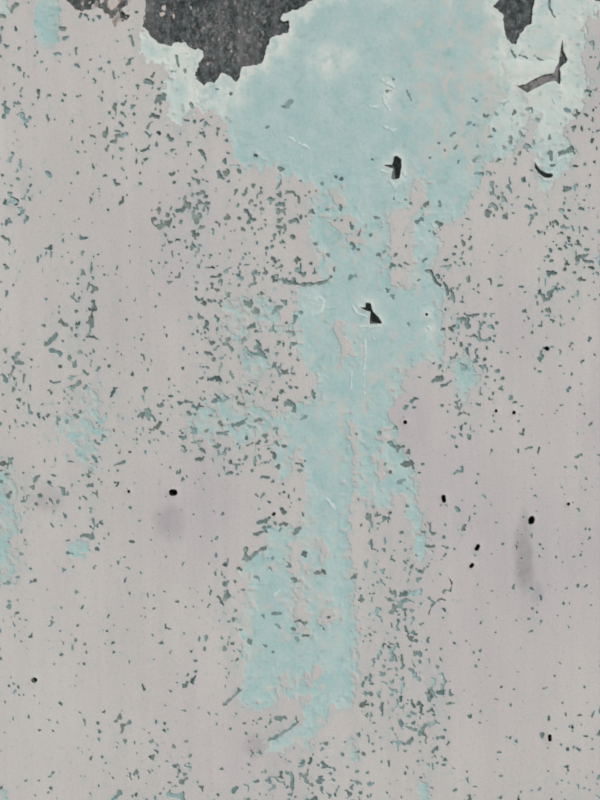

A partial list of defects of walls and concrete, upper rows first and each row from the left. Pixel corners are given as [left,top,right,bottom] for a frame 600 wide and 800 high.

peeling [1,83,35,129]
peeling [0,152,41,255]
peeling [518,175,600,338]
peeling [56,251,118,341]
peeling [113,710,137,754]
peeling [110,729,204,800]
peeling [540,728,600,751]